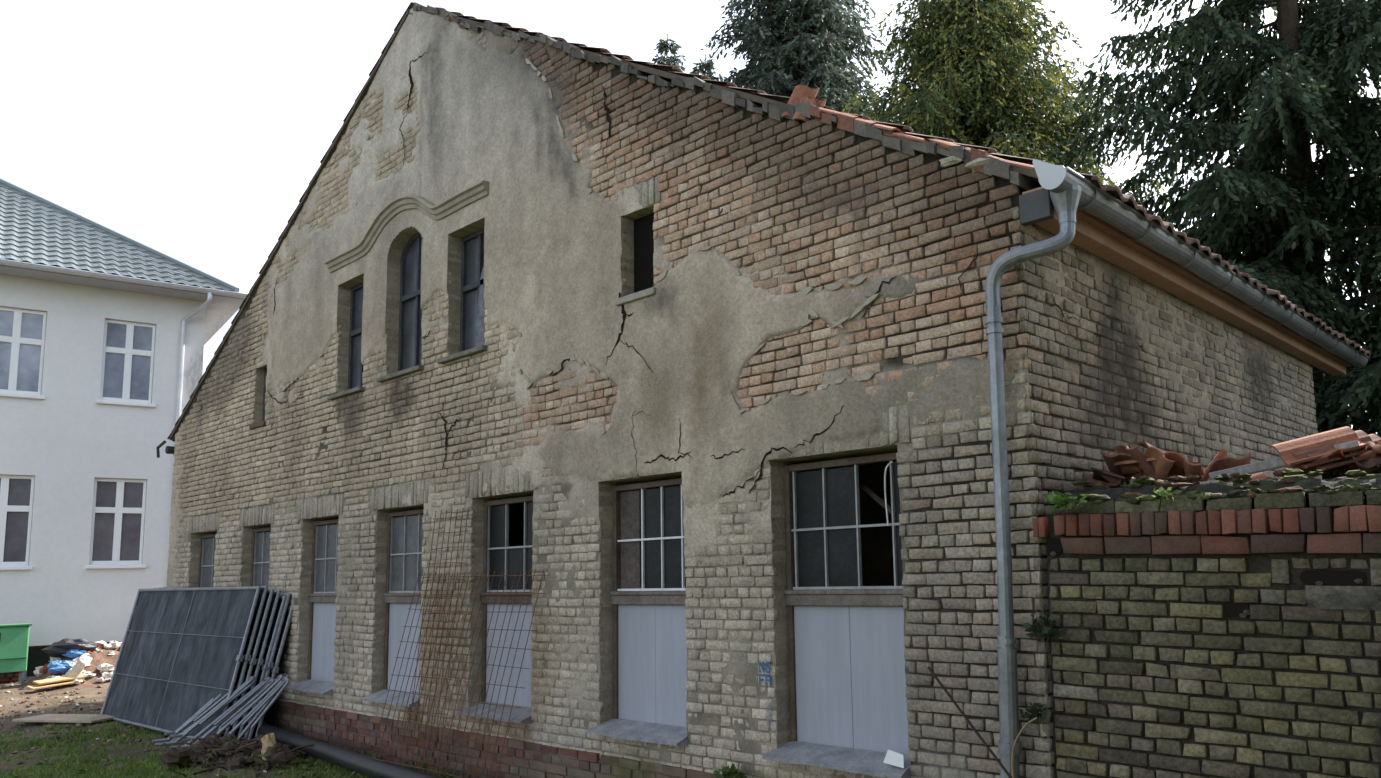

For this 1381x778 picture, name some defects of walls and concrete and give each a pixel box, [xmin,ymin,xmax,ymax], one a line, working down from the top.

crack [399,52,428,164]
flaking render [526,49,1030,417]
crack [606,292,653,372]
crack [631,406,843,497]